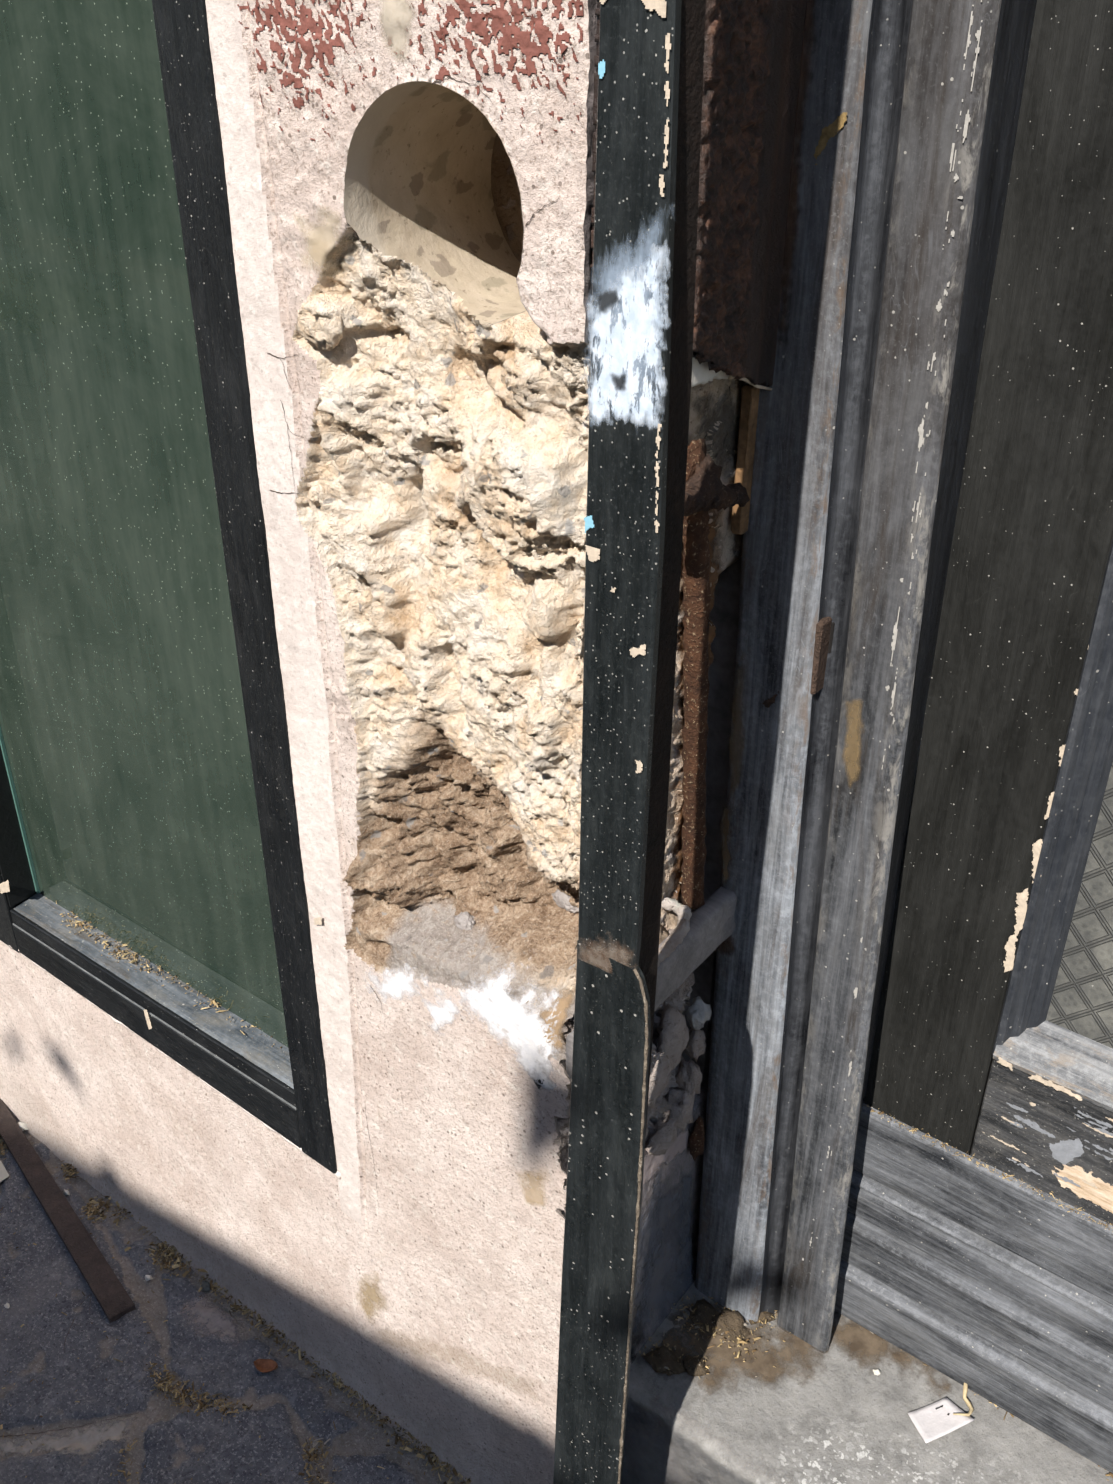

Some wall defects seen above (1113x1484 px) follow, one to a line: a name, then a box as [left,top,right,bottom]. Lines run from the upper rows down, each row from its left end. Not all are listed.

flaking render [237,0,605,1218]
corrosion [672,774,684,898]
peeling [1003,839,1043,972]
efflorescence [369,964,557,1090]
peeling [983,1057,1113,1213]
spalling [617,962,712,1484]